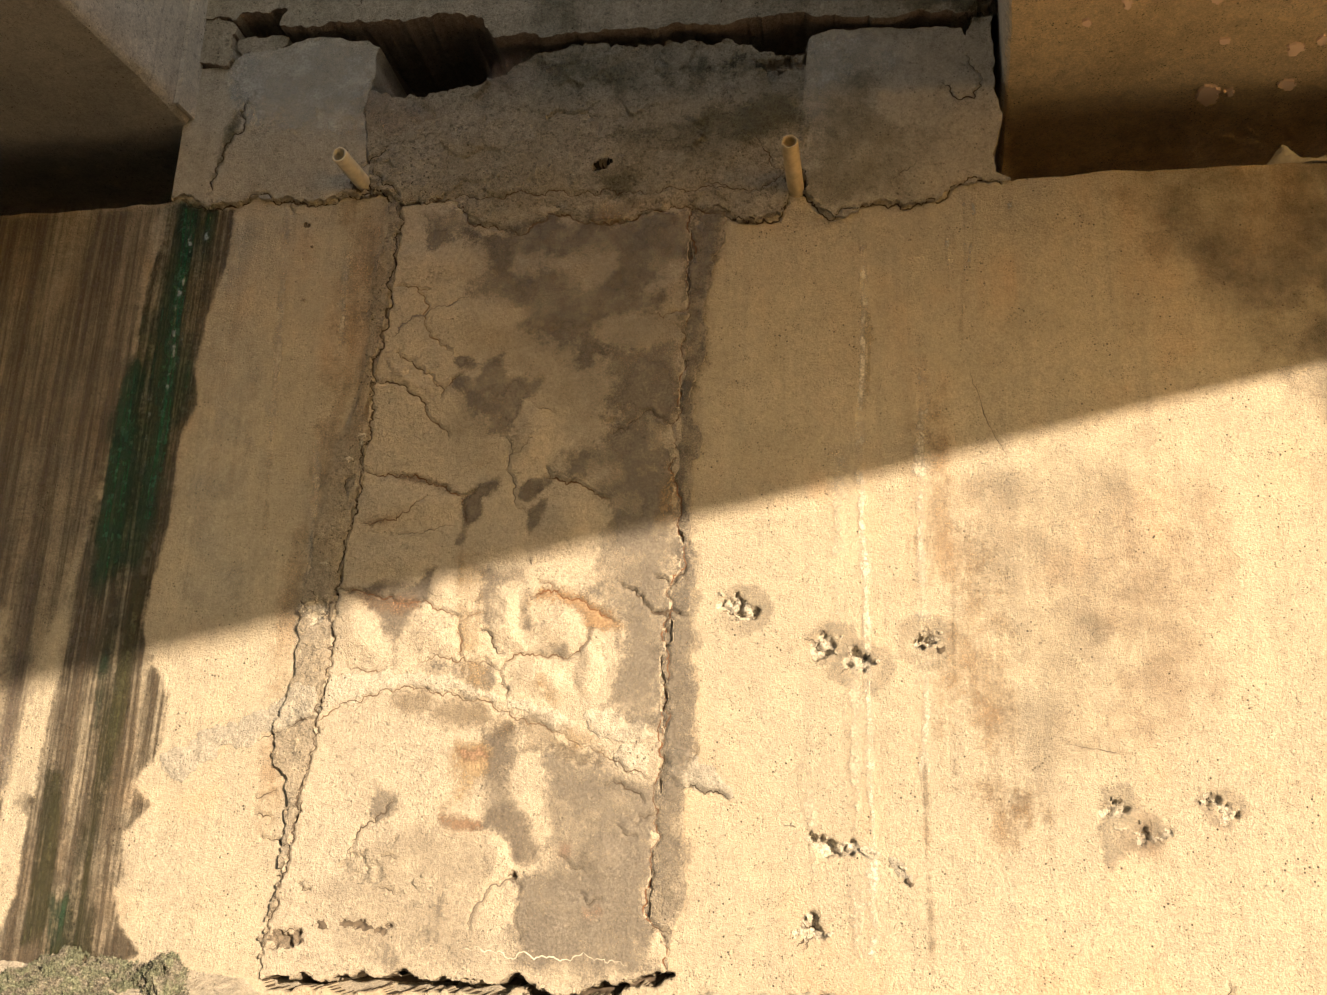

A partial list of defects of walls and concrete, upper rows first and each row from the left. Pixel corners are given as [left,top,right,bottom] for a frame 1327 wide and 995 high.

crack [941,55,983,100]
water stain [425,200,691,731]
crack [185,103,1001,995]
water stain [0,204,234,965]
spalling [716,592,761,622]
spalling [807,627,883,674]
water stain [482,724,516,783]
water stain [481,745,659,975]
spalling [784,822,915,887]
spalling [267,928,304,950]
spalling [317,919,393,936]
spalling [792,909,835,949]